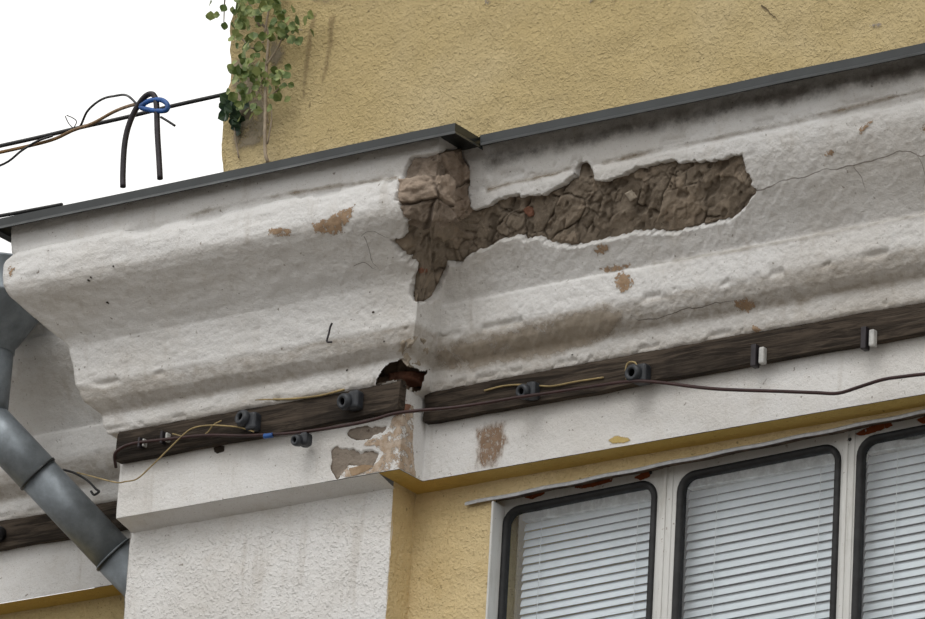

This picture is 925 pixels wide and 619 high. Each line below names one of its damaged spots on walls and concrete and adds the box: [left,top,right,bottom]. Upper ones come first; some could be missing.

crack [739,151,925,192]
spalling [312,204,355,236]
spalling [395,148,756,302]
spalling [376,336,430,392]
peeling [331,404,416,480]